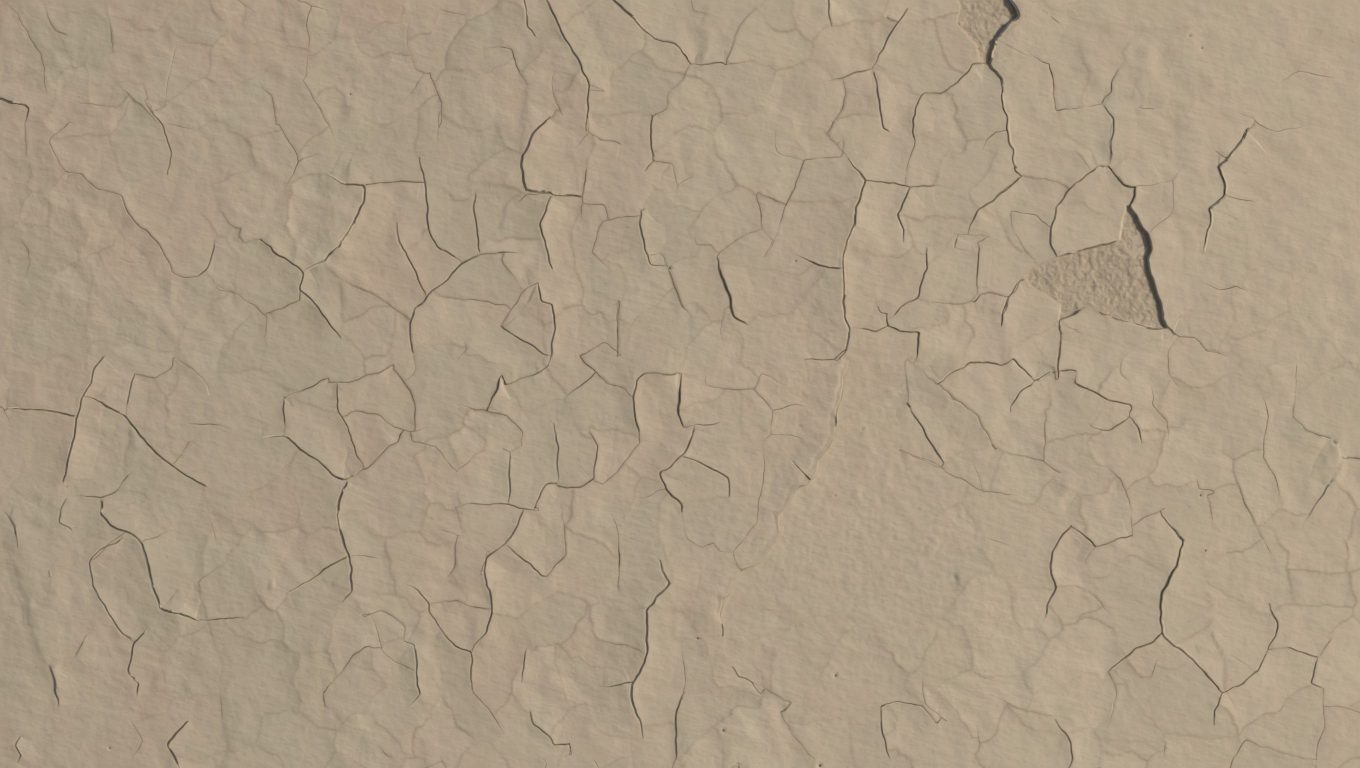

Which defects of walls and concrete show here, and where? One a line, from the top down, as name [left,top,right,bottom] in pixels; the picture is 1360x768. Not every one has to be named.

peeling [958,0,1082,176]
crack [894,51,1178,319]
crack [4,0,987,577]
peeling [796,142,1195,415]
peeling [633,373,752,512]
crack [1035,328,1224,448]
crack [50,532,165,710]
peeling [602,552,714,768]
crack [997,633,1170,768]
peeling [1045,515,1132,624]
peeling [1160,494,1236,693]
crack [1214,594,1360,768]